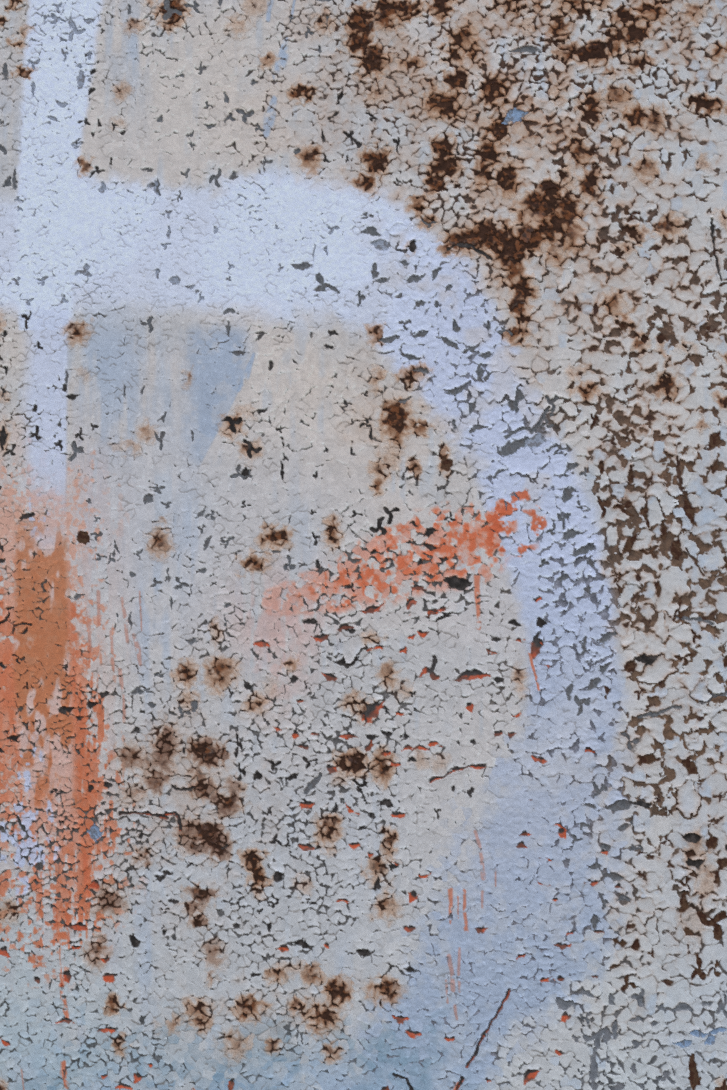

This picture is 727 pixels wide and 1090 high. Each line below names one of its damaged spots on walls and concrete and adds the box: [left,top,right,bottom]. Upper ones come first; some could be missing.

crack [227,0,456,231]
rust [309,0,727,350]
rust [107,615,303,902]
crack [0,508,442,1090]
rust [365,360,453,499]
peeling [399,607,451,653]
crack [391,0,727,1090]
peeling [625,629,704,712]
peeling [704,432,727,483]
rust [151,881,410,1068]
crack [369,847,460,978]
peeling [584,844,654,957]